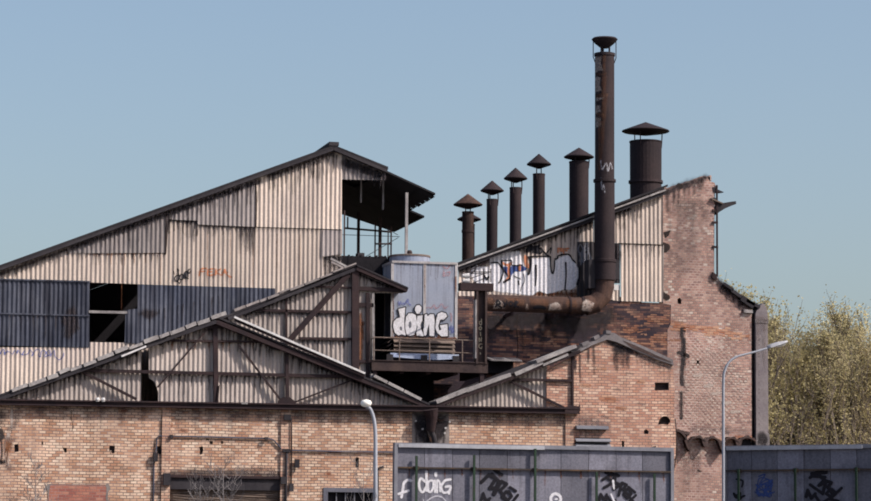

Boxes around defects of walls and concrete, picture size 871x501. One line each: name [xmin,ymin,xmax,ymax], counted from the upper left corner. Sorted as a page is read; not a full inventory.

water stain [0,151,386,277]
corrosion [534,289,577,297]
spalling [621,314,752,465]